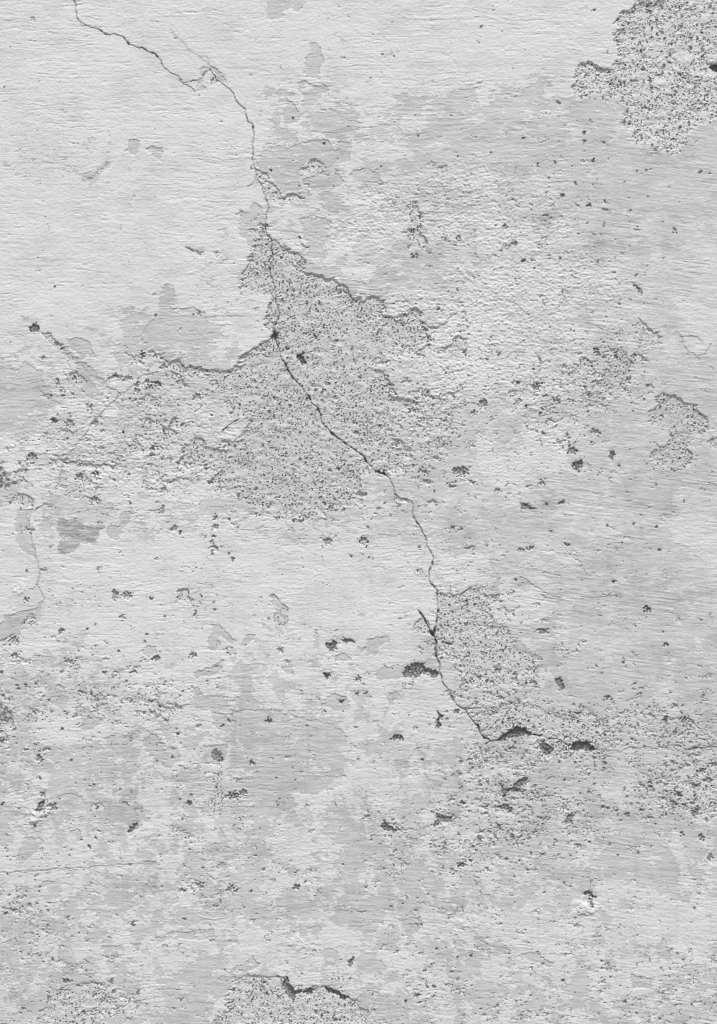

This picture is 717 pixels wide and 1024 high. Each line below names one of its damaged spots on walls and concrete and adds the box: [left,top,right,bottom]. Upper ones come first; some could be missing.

spalling [556,0,717,157]
crack [27,371,159,599]
spalling [7,43,478,574]
crack [71,0,501,743]
spalling [560,317,717,475]
spalling [412,586,615,766]
crack [519,576,622,599]